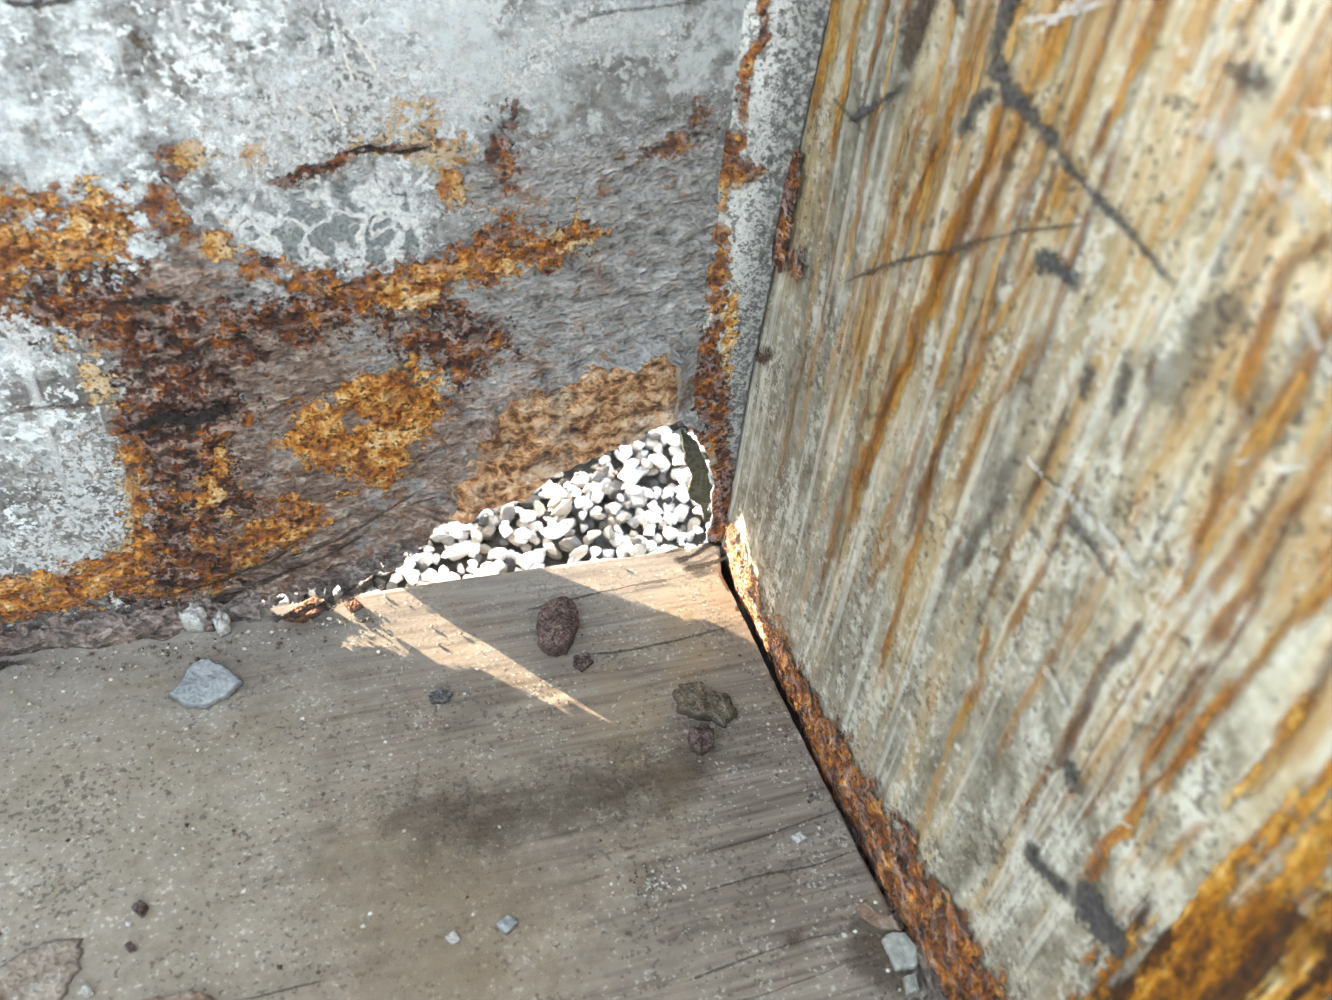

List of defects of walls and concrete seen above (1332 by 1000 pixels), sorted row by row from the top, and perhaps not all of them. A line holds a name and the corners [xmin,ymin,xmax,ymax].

rust [1173,52,1240,229]
rust [1274,8,1332,119]
rust [0,92,617,625]
peeling [0,0,728,670]
rust [823,0,1169,666]
rust [1233,233,1328,400]
peeling [429,688,454,704]
rust [536,596,594,672]
rust [636,0,1014,1000]
rust [1054,622,1141,769]
rust [1082,315,1332,882]
rust [1067,758,1332,1000]